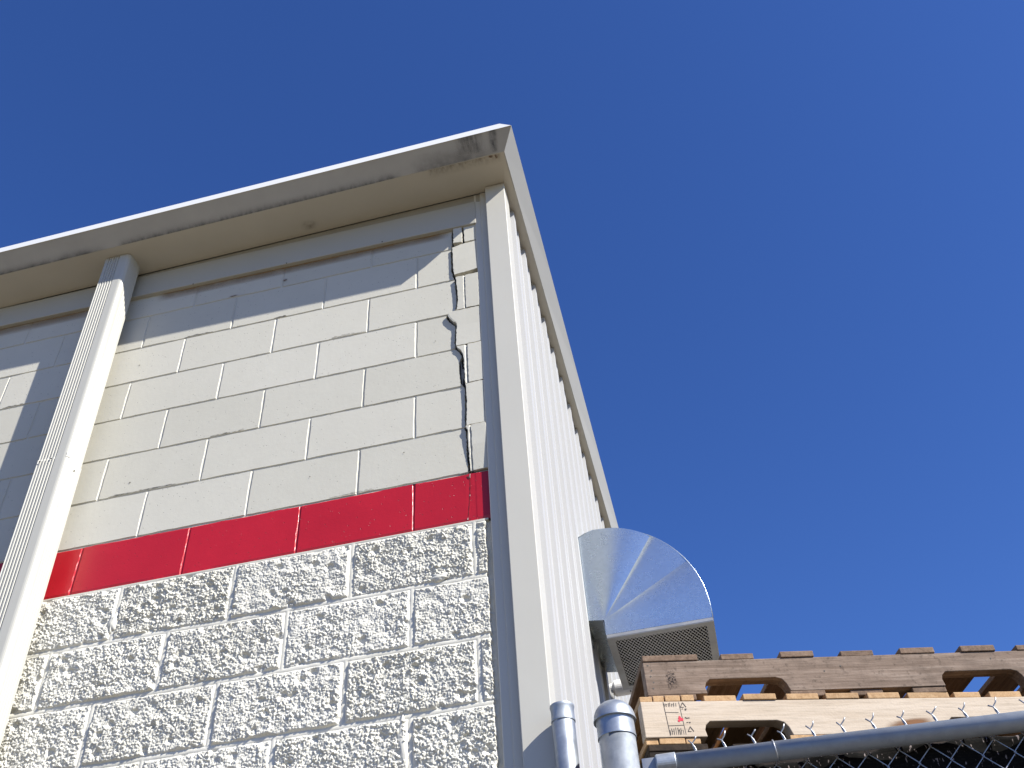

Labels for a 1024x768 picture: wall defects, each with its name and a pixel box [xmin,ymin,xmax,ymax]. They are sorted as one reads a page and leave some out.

crack [447,230,471,520]